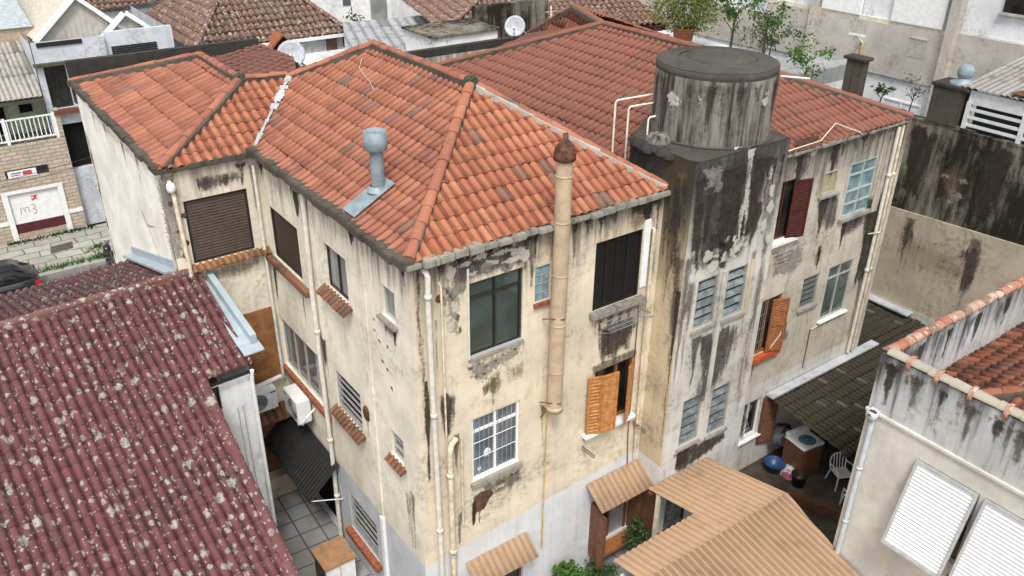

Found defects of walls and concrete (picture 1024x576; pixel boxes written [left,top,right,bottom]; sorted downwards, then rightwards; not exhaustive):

leakage [196,161,262,206]
leakage [902,125,938,197]
leakage [971,146,1015,221]
leakage [902,218,920,252]
peeling [443,243,530,334]
leakage [632,148,774,433]
leakage [956,240,980,291]
leakage [878,362,923,405]
leakage [964,406,976,435]
leakage [992,417,1024,462]